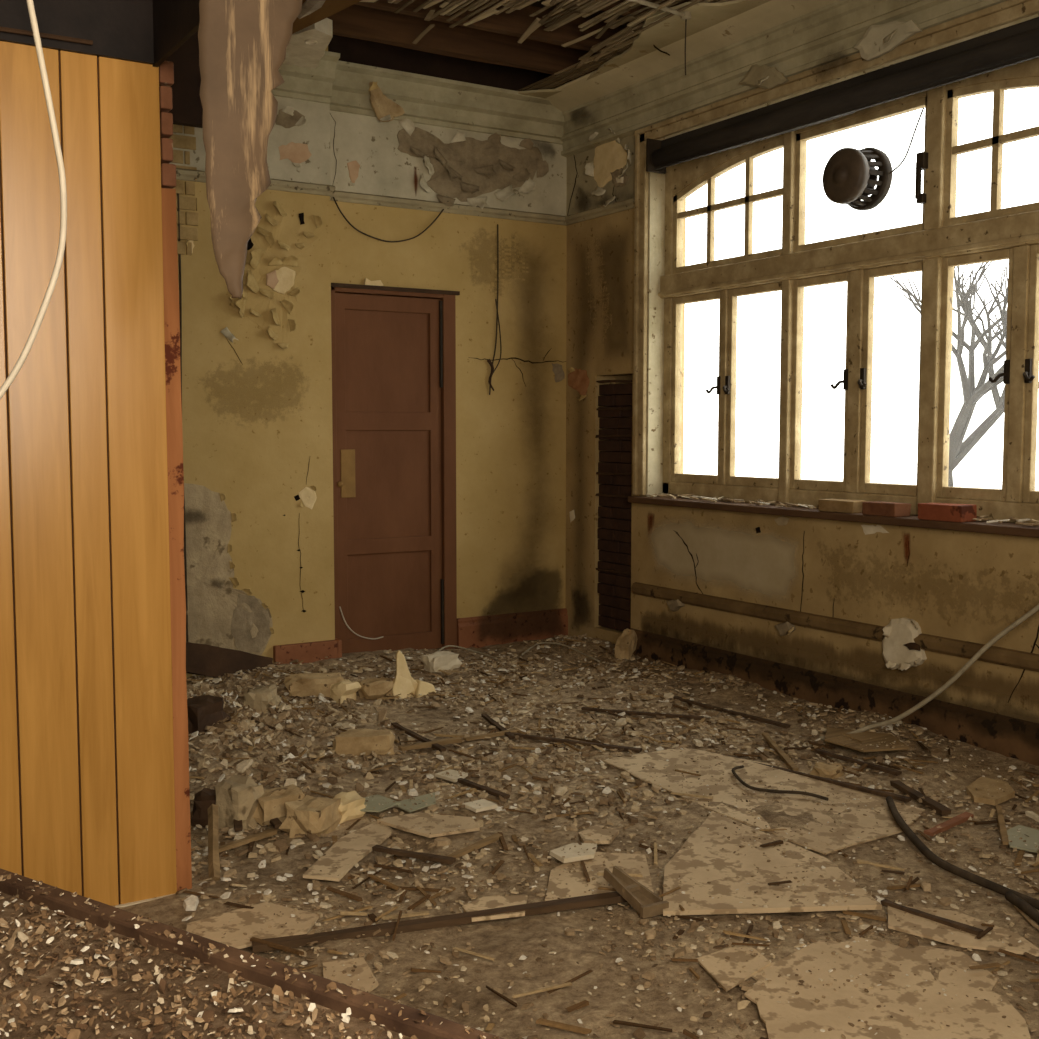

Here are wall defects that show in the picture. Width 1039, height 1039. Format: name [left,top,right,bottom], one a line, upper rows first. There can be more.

peeling [854,20,922,61]
flaking render [275,106,307,128]
flaking render [368,82,549,209]
peeling [585,128,631,208]
peeling [229,199,323,350]
flaking render [184,483,275,655]
crack [673,530,703,594]
flaking render [882,618,927,671]
crack [1008,626,1039,703]